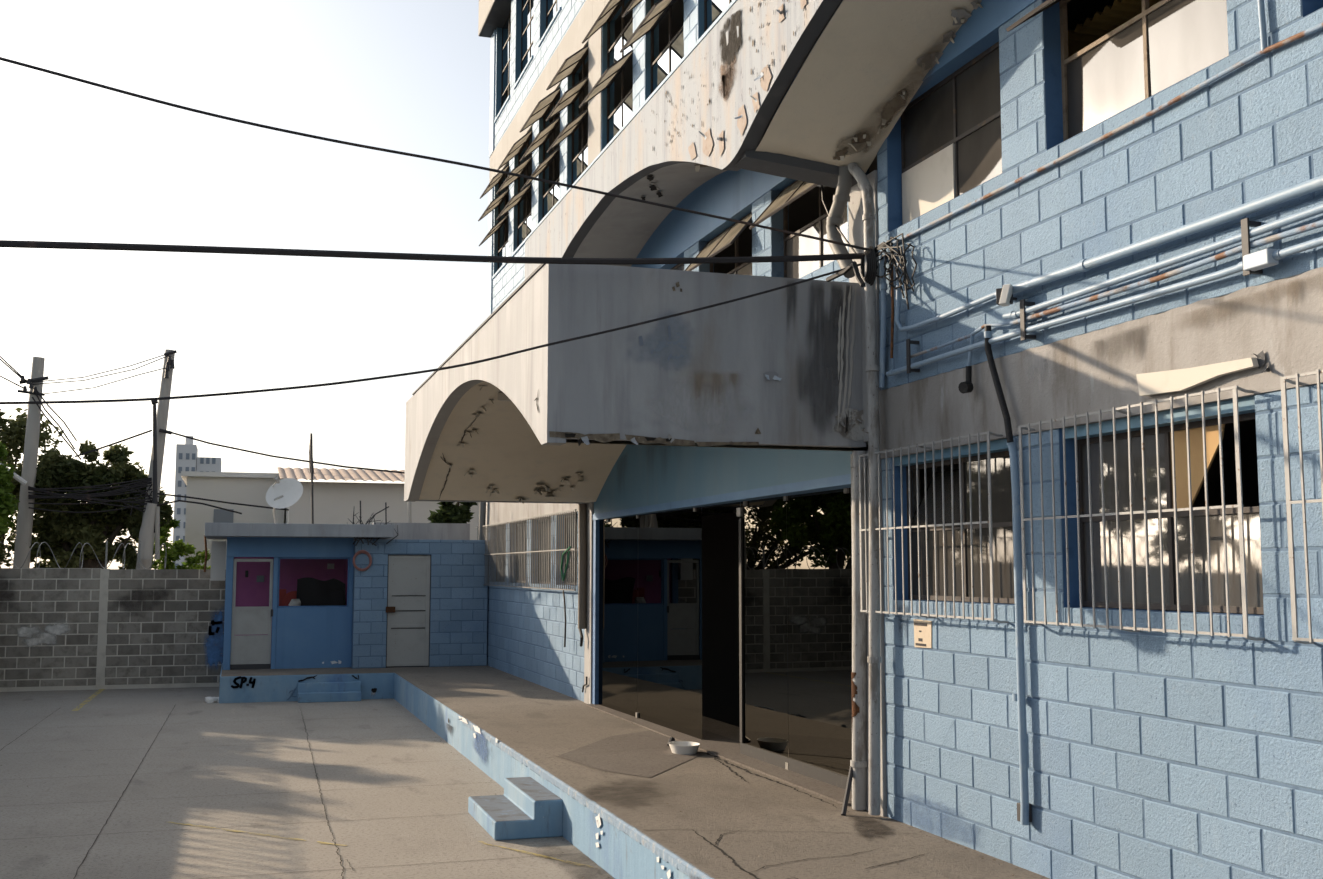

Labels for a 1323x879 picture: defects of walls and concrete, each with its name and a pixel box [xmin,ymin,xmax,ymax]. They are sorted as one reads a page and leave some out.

peeling [651,0,807,172]
peeling [833,89,908,161]
water stain [787,285,796,317]
water stain [800,285,856,431]
crack [287,675,353,879]